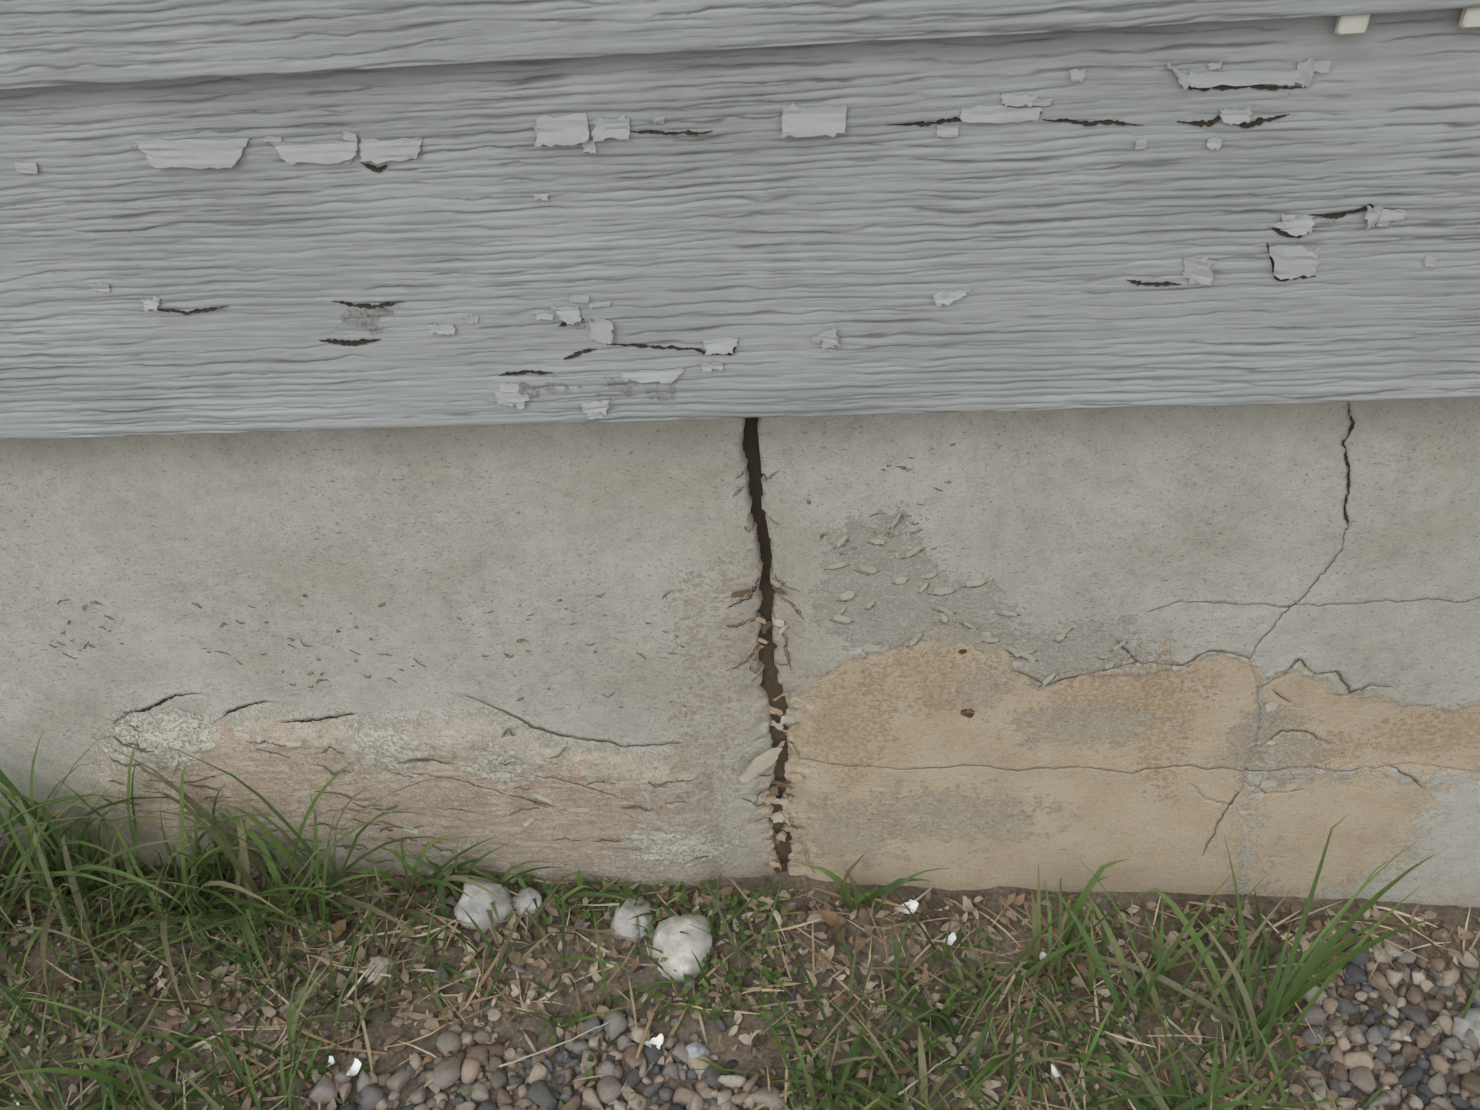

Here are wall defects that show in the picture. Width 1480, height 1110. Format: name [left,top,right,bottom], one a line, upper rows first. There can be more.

peeling [131,130,423,173]
peeling [534,113,713,154]
peeling [781,103,847,138]
peeling [890,92,1148,150]
peeling [1167,57,1332,151]
peeling [1267,204,1405,281]
peeling [319,301,404,346]
peeling [495,294,739,419]
crack [722,401,1480,874]
crack [111,693,354,783]
crack [466,696,671,748]
peeling [757,621,1480,899]